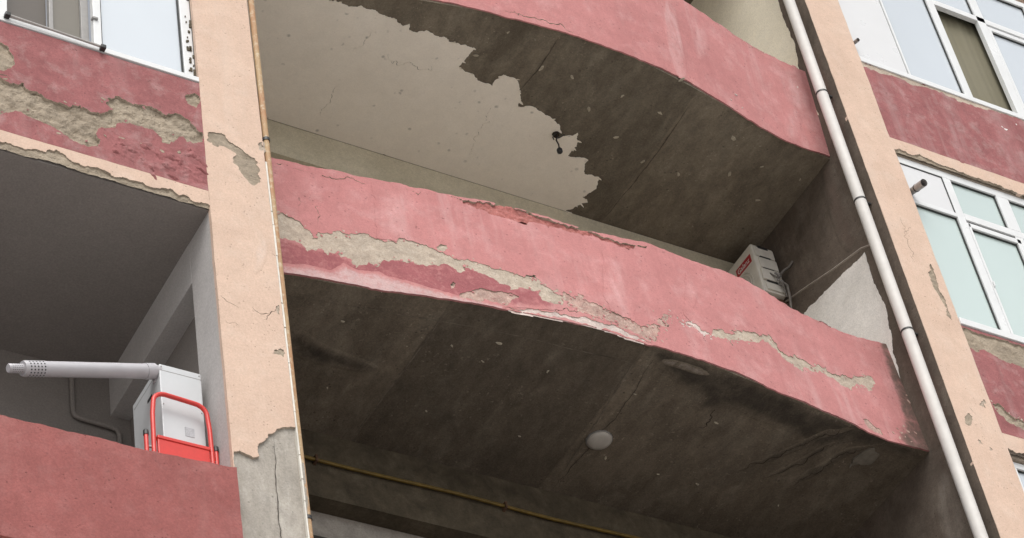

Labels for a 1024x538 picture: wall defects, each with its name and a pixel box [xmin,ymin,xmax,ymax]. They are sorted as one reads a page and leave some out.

flaking render [0,44,266,185]
peeling [329,0,827,263]
spalling [0,143,209,209]
flaking render [277,211,875,391]
flaking render [929,265,951,319]
flaking render [963,328,1024,368]
crack [738,424,862,471]
flaking render [980,400,1024,430]
spalling [230,428,310,538]